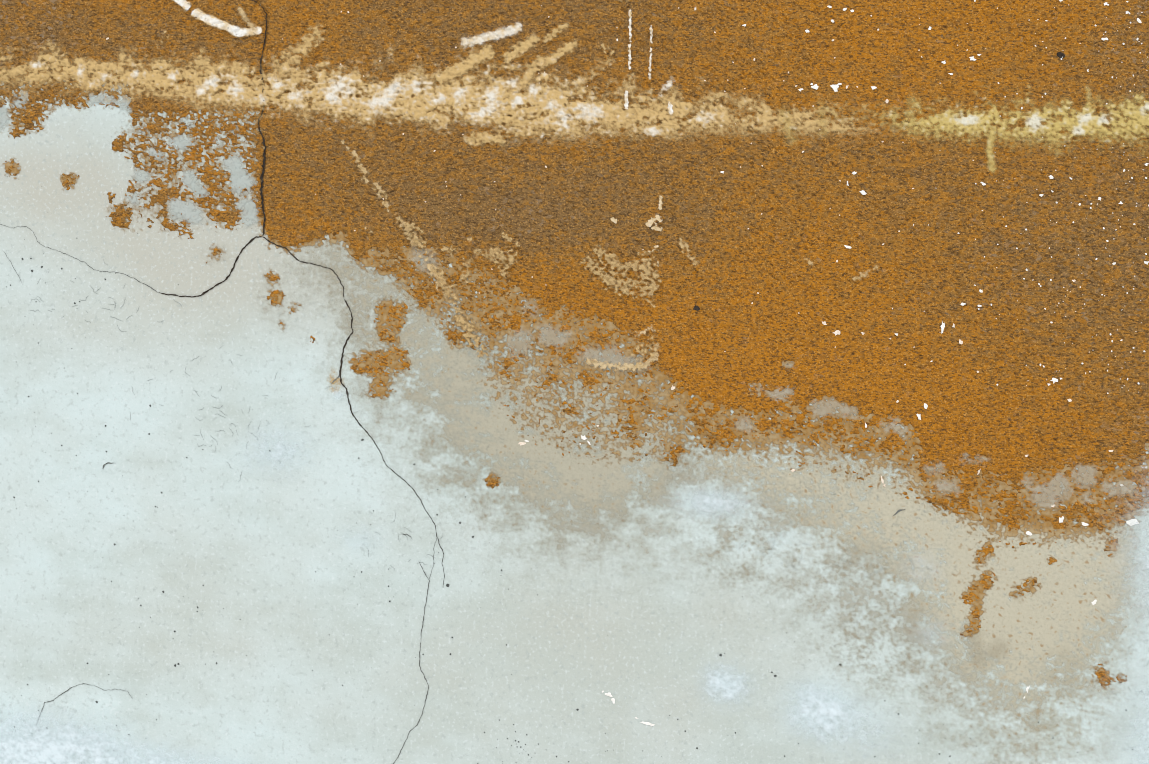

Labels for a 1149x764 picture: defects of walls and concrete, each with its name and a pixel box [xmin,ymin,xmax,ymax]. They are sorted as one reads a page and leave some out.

crack [1,0,445,764]
rust [0,0,1149,570]
damp [321,243,1149,736]
rust [960,570,998,637]
rust [1009,577,1041,598]